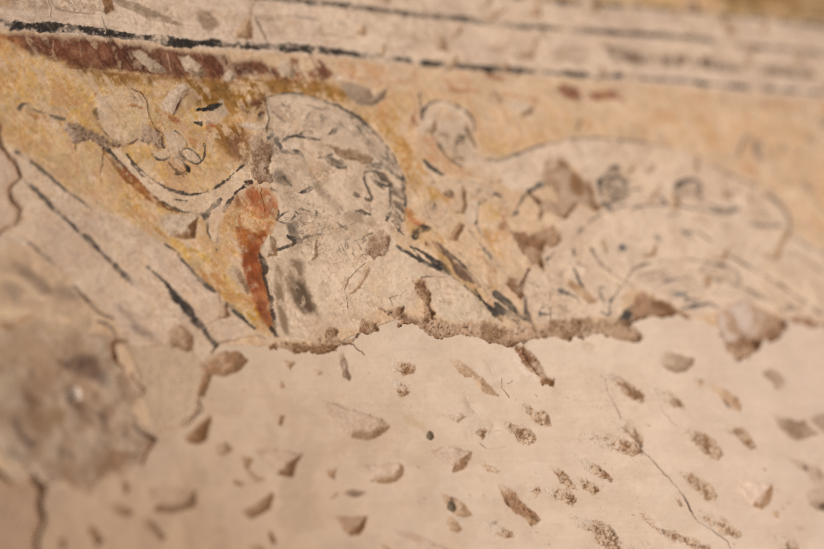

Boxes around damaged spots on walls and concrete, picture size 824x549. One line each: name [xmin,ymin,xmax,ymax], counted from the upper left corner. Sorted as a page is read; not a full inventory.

crack [0,125,23,234]
flaking render [503,156,602,300]
flaking render [269,317,380,355]
flaking render [378,279,692,388]
flaking render [716,300,824,361]
crack [32,471,51,549]
crack [639,444,732,549]